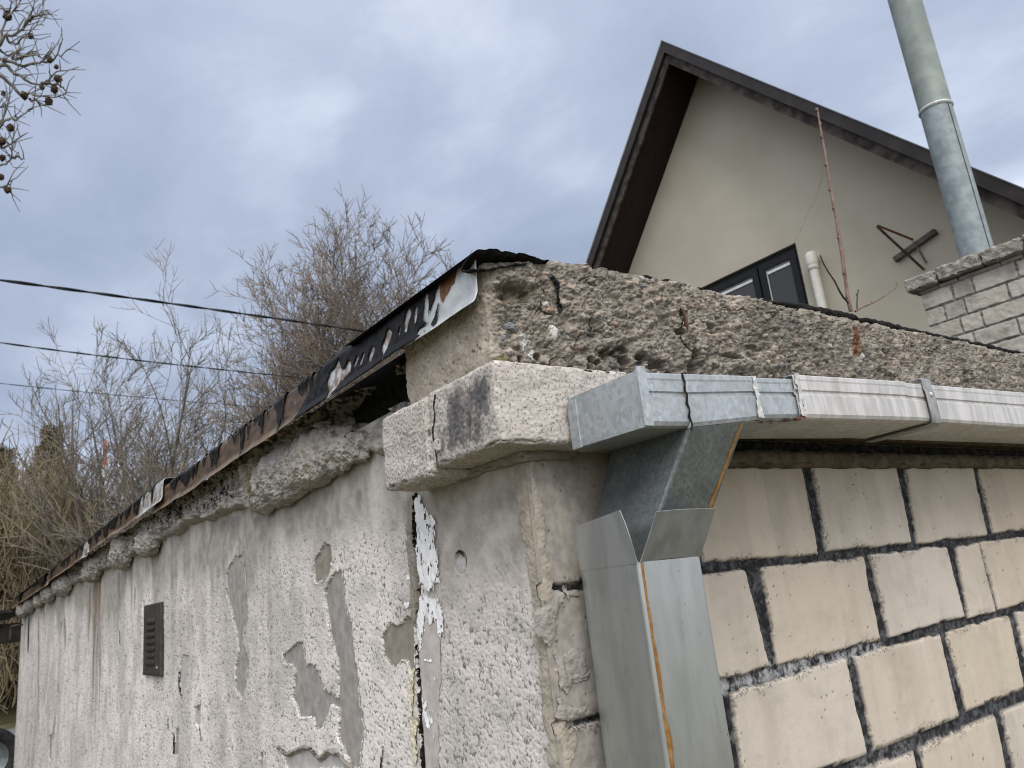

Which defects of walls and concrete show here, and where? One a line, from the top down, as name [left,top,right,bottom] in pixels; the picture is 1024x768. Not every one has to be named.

crack [431,394,439,467]
leakage [441,376,489,451]
rust [852,326,863,355]
peeling [226,554,249,701]
peeling [276,543,366,768]
peeling [382,495,444,672]